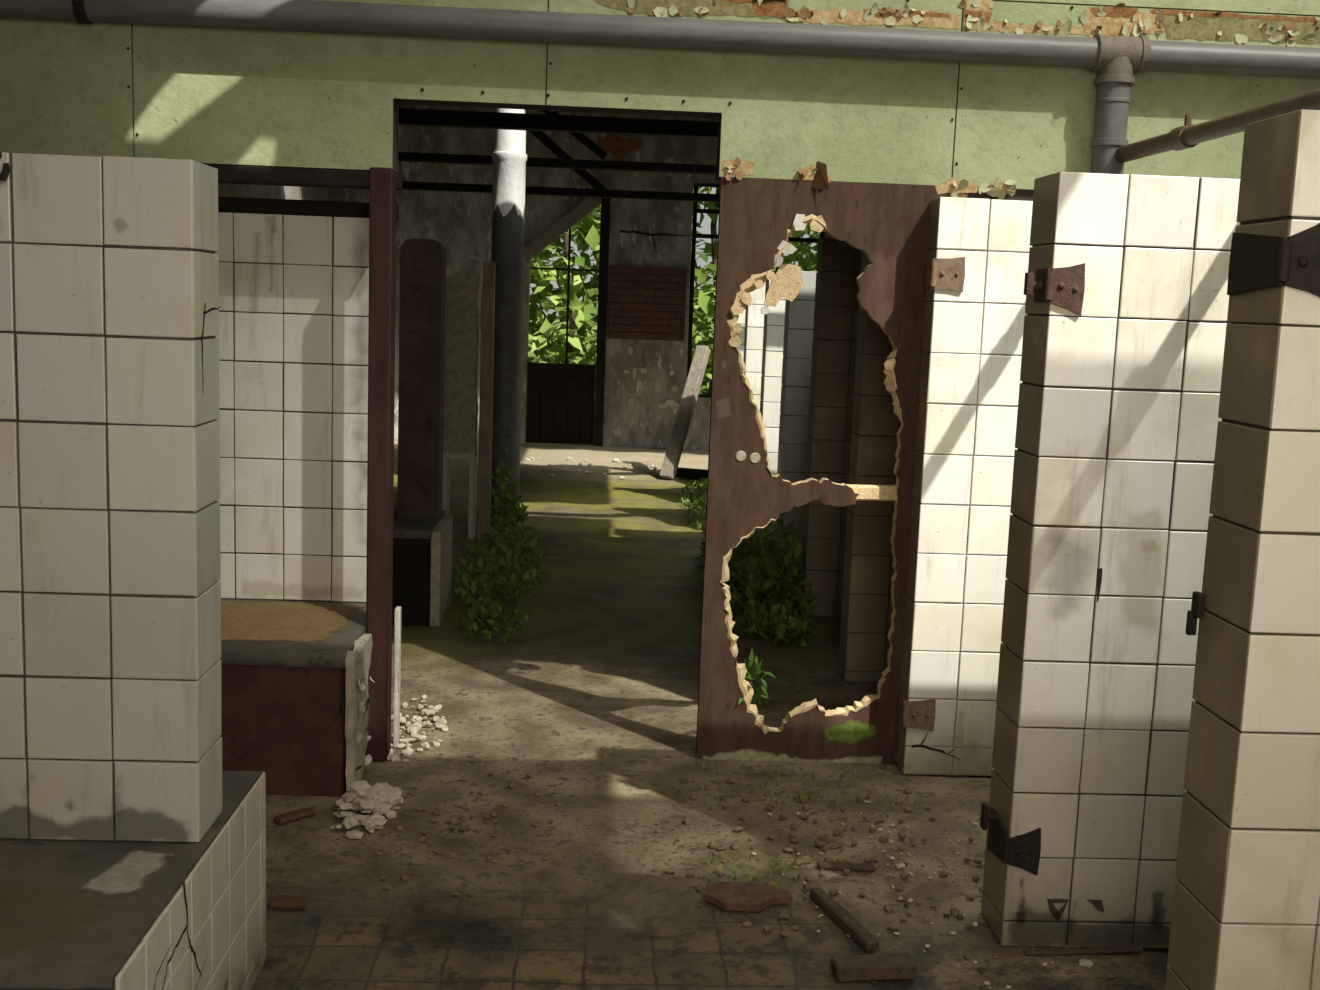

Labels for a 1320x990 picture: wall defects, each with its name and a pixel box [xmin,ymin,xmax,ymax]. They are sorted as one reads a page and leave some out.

peeling [595,0,1320,47]
peeling [728,214,826,347]
crack [153,881,208,990]